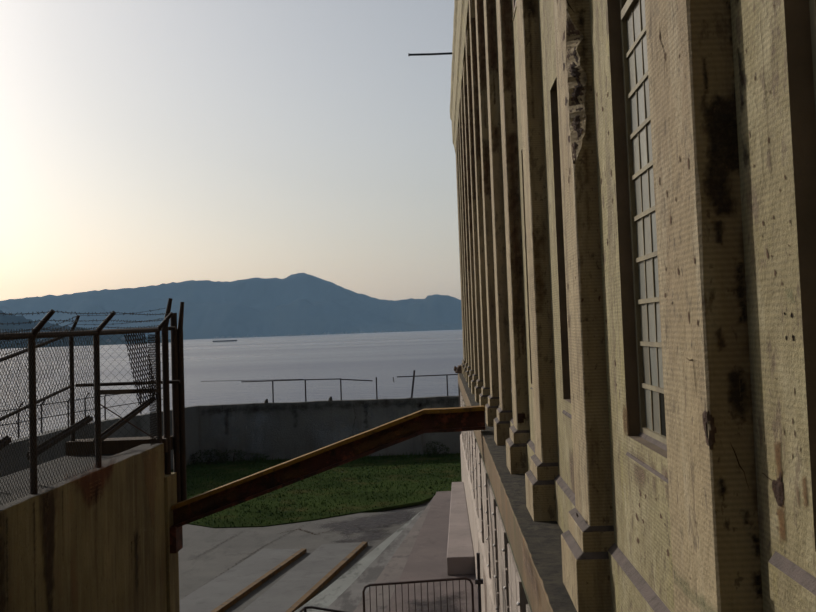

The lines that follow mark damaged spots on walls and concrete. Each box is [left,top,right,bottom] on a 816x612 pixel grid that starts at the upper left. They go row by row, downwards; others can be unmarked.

spalling [562,9,597,183]
water stain [702,5,748,244]
spalling [702,411,717,450]